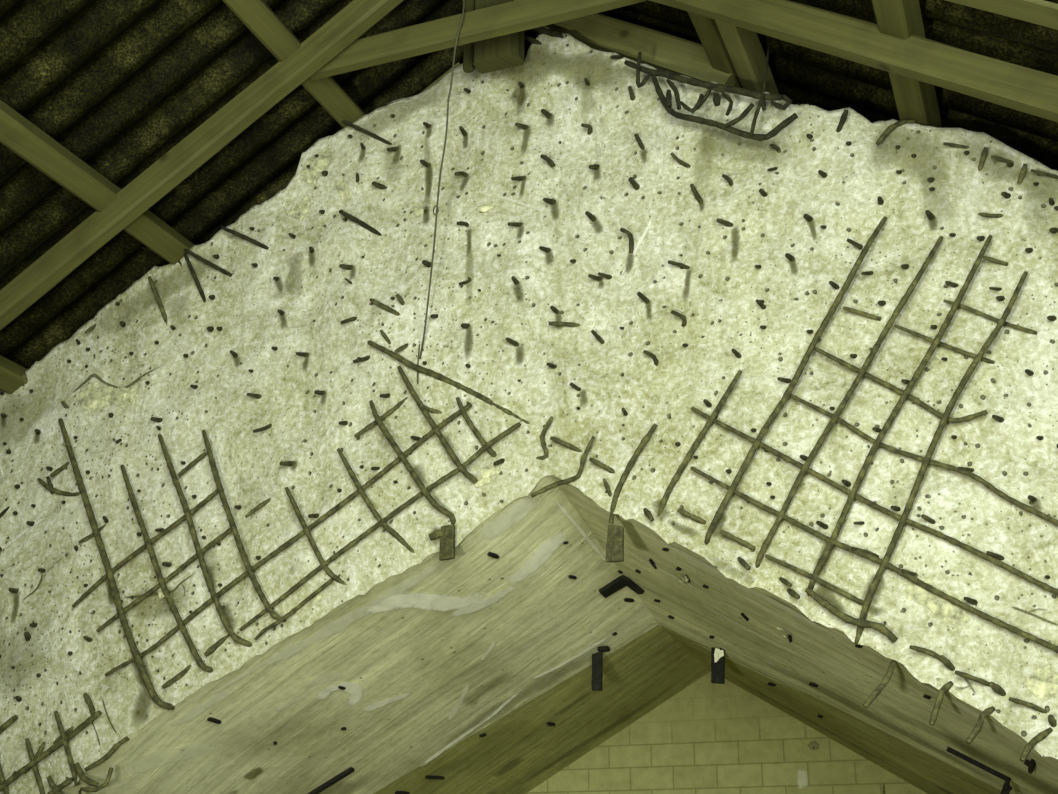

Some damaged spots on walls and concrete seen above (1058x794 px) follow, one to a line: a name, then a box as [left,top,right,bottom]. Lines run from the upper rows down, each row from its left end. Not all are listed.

rust [513,88,525,103]
rust [424,166,432,222]
spalling [367,329,530,424]
spalling [475,462,500,487]
peeling [483,416,658,537]
spalling [245,498,271,518]
peeling [367,533,566,616]
spalling [258,593,322,629]
spalling [906,576,968,624]
peeling [317,682,409,711]
spalling [863,660,896,708]
spalling [910,645,1058,774]